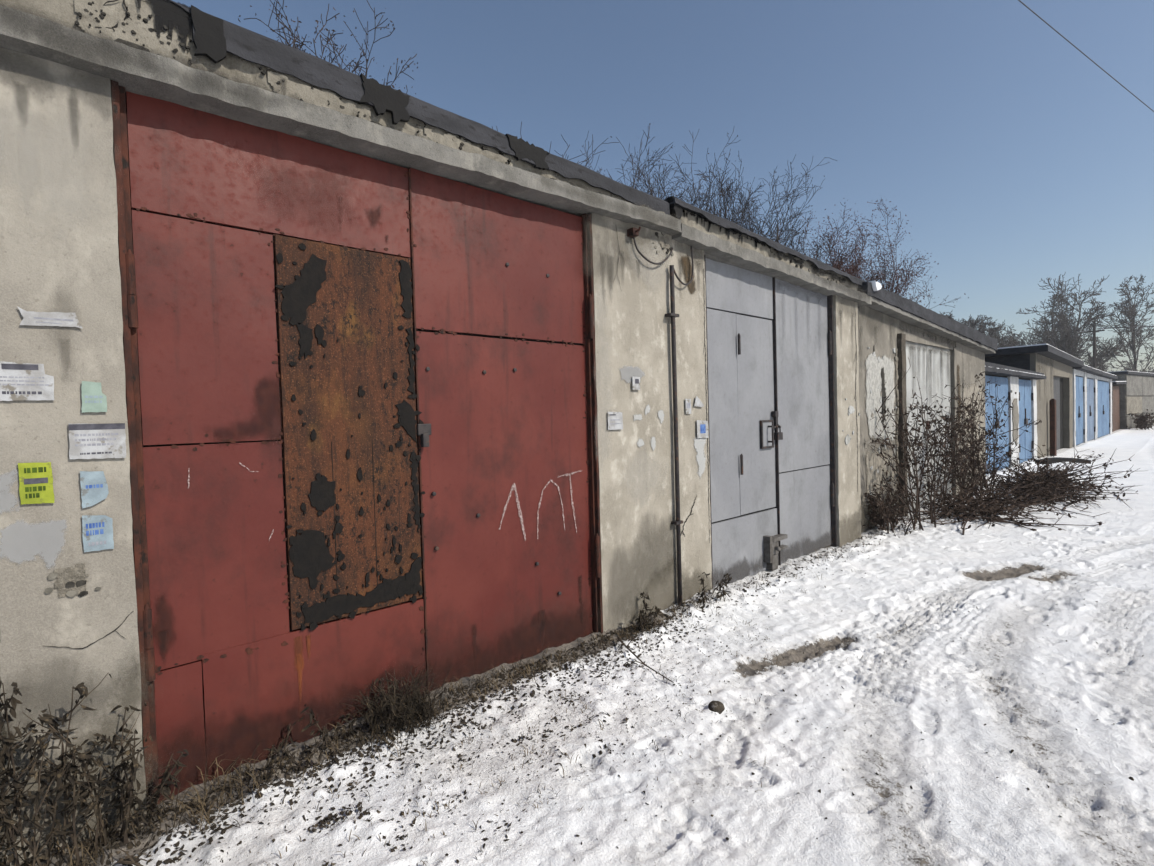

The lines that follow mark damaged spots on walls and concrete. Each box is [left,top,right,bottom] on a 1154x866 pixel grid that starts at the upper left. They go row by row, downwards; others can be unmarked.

spalling [74,0,192,66]
peeling [842,345,899,521]